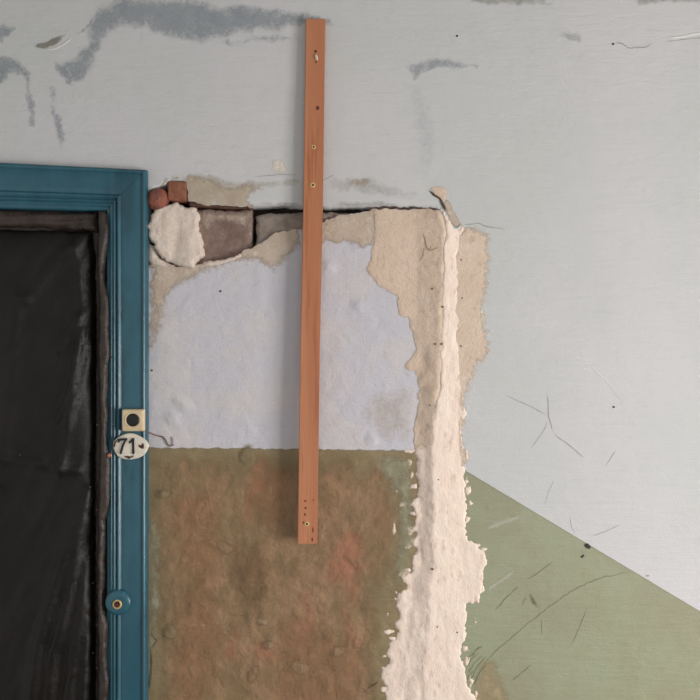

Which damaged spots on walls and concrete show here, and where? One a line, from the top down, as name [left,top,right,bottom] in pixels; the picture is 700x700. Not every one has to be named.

damp [59,0,303,83]
crack [371,204,439,212]
spalling [149,176,303,347]
peeling [322,187,490,466]
crack [482,572,625,668]